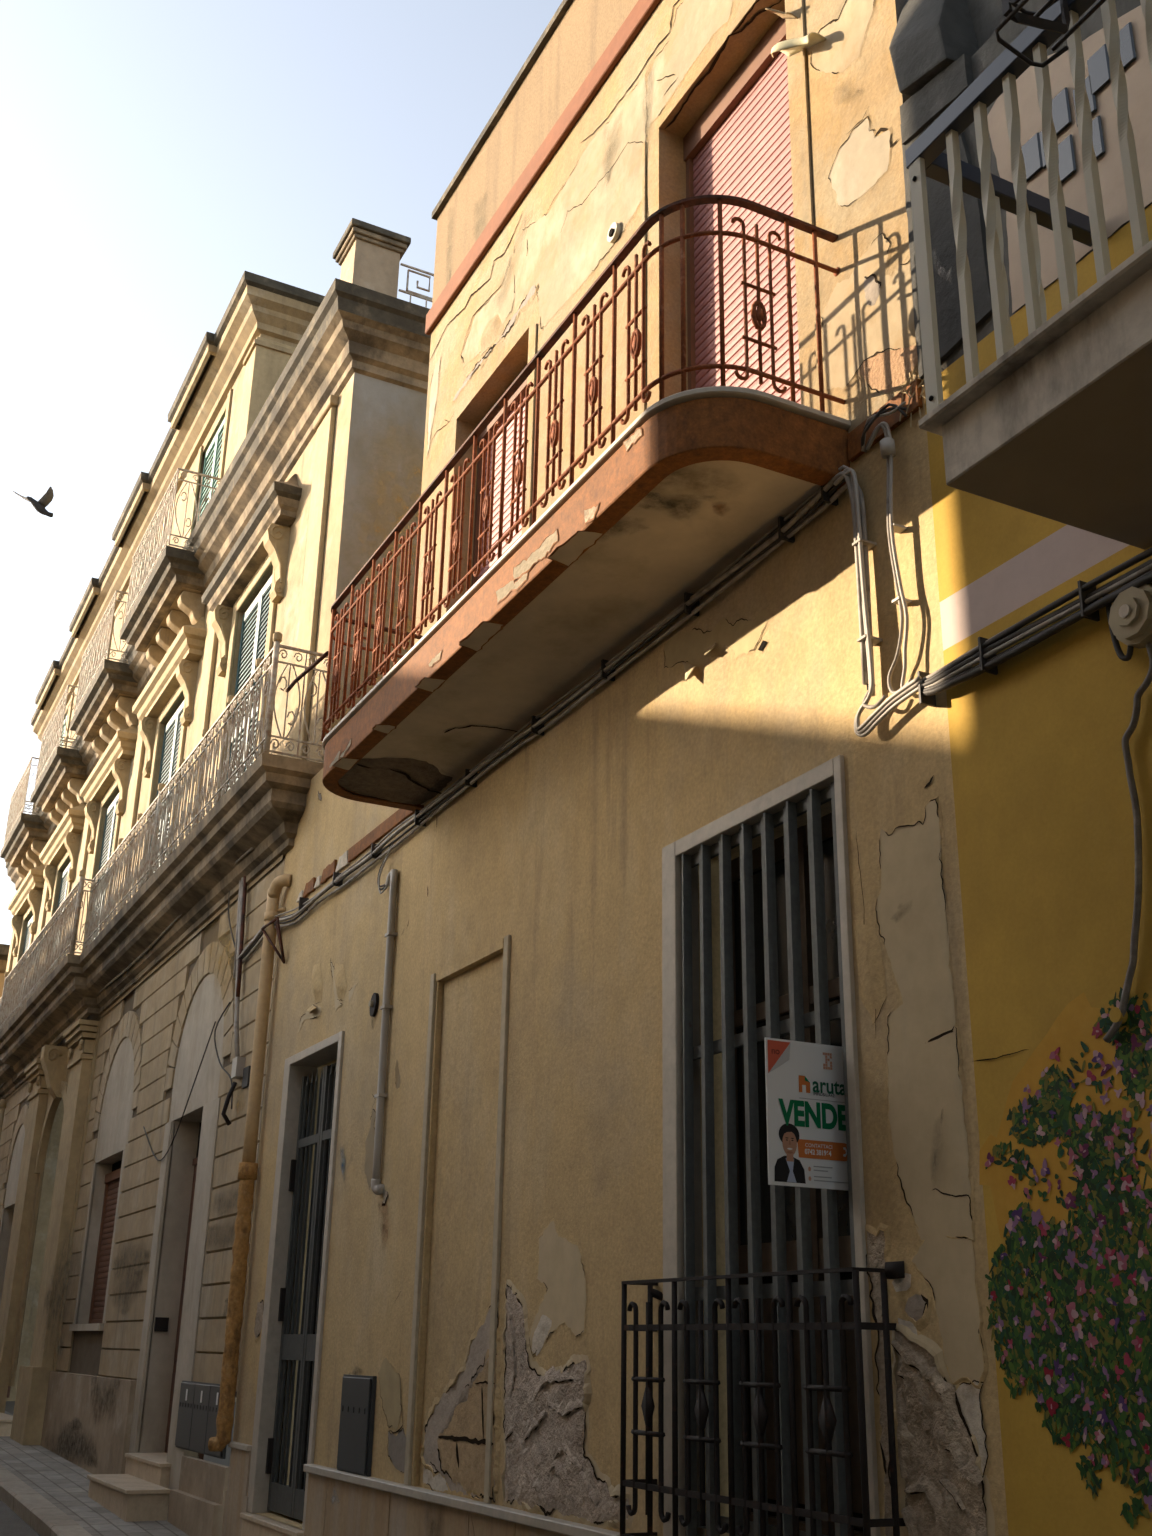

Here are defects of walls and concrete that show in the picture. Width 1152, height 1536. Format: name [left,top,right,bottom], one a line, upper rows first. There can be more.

flaking render [765,0,876,78]
flaking render [827,114,893,210]
spalling [318,737,457,805]
flaking render [874,796,975,1242]
flaking render [387,1279,634,1531]
flaking render [865,1223,995,1536]